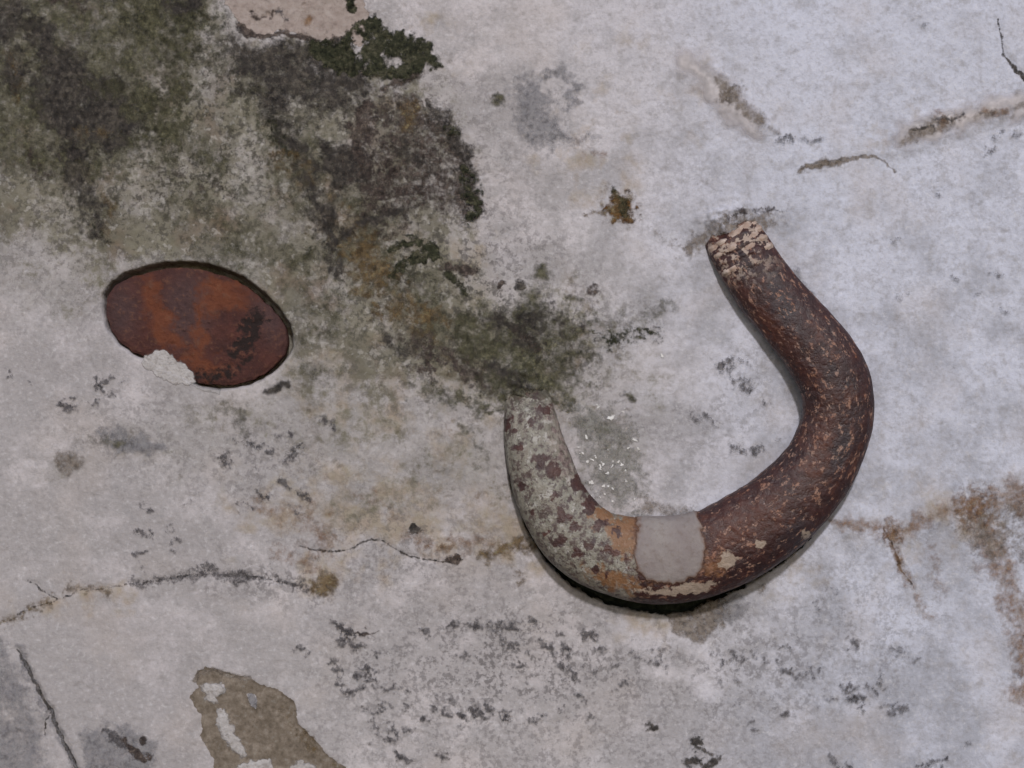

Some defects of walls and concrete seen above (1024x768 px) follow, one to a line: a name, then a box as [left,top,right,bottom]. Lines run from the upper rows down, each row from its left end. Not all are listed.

crack [997,18,1024,81]
water stain [230,36,424,272]
water stain [426,99,479,221]
water stain [518,66,581,150]
crack [798,154,896,173]
water stain [383,330,493,413]
crack [3,523,463,622]
rust [477,535,537,565]
rust [839,516,923,537]
rust [944,485,1024,621]
crack [16,647,78,768]
spalling [190,666,346,768]